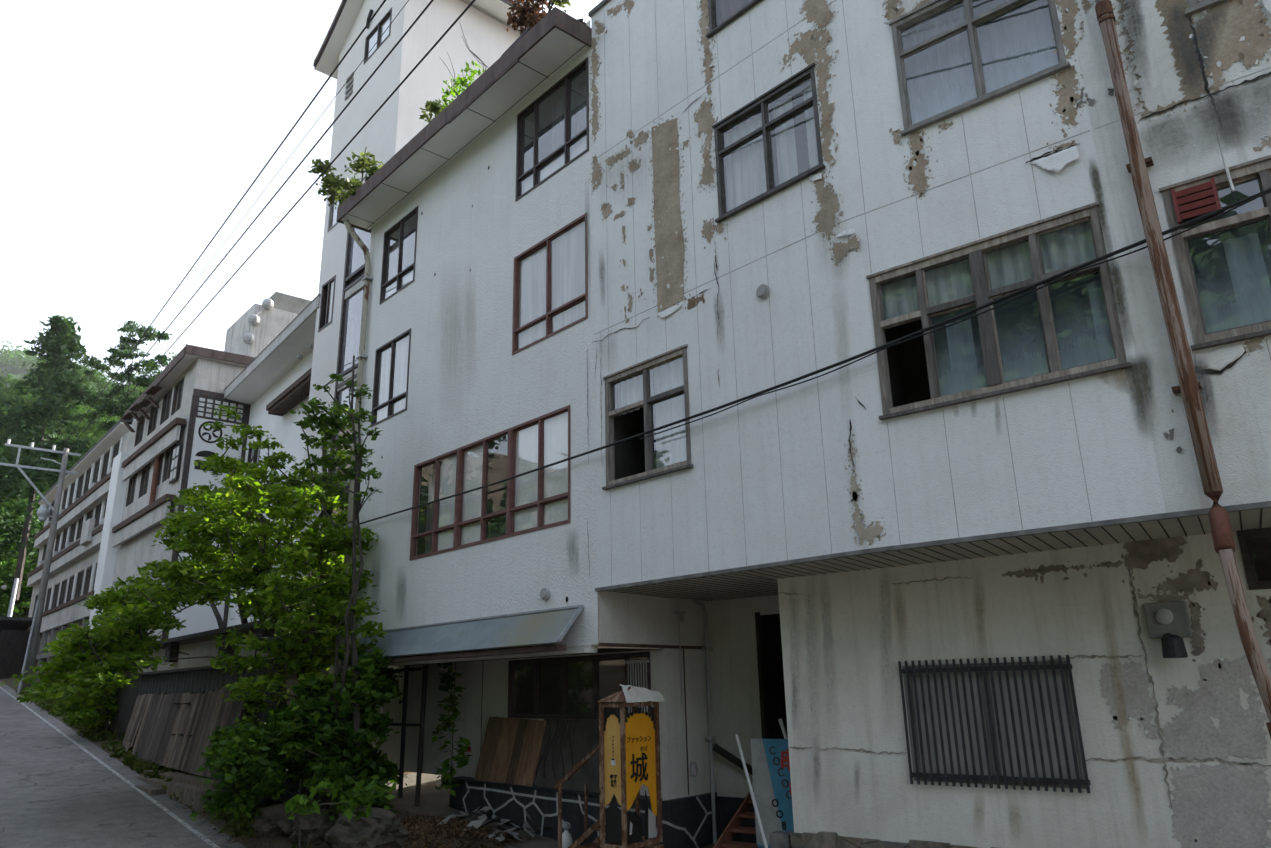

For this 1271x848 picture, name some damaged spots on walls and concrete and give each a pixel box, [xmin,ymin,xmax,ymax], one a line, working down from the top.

peeling [1046,0,1271,152]
peeling [585,0,727,324]
peeling [779,0,861,266]
peeling [889,119,954,200]
peeling [844,434,886,545]
crack [788,747,907,755]
crack [892,577,972,585]
spalling [1002,536,1219,662]
peeling [1099,658,1157,740]
crack [1048,554,1271,808]
peeling [1167,762,1271,848]
peeling [1251,595,1271,669]